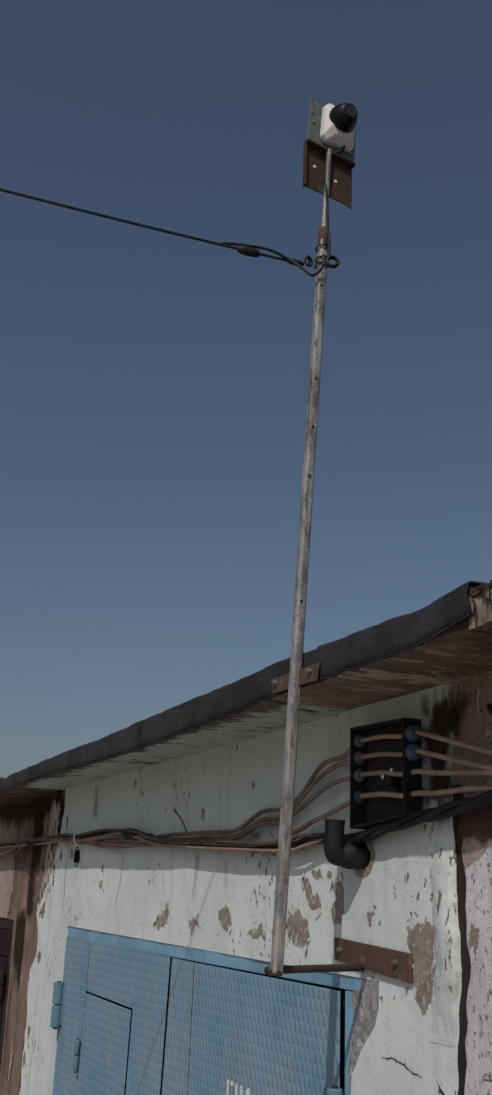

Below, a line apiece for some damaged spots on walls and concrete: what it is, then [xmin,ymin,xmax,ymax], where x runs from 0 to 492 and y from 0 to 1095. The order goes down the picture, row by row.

damp [0,790,65,986]
peeling [153,903,169,930]
peeling [218,904,231,933]
peeling [248,922,264,939]
peeling [286,841,375,955]
peeling [405,918,436,1015]
crack [382,784,492,1095]
peeling [467,924,480,949]
spalling [348,971,383,1090]